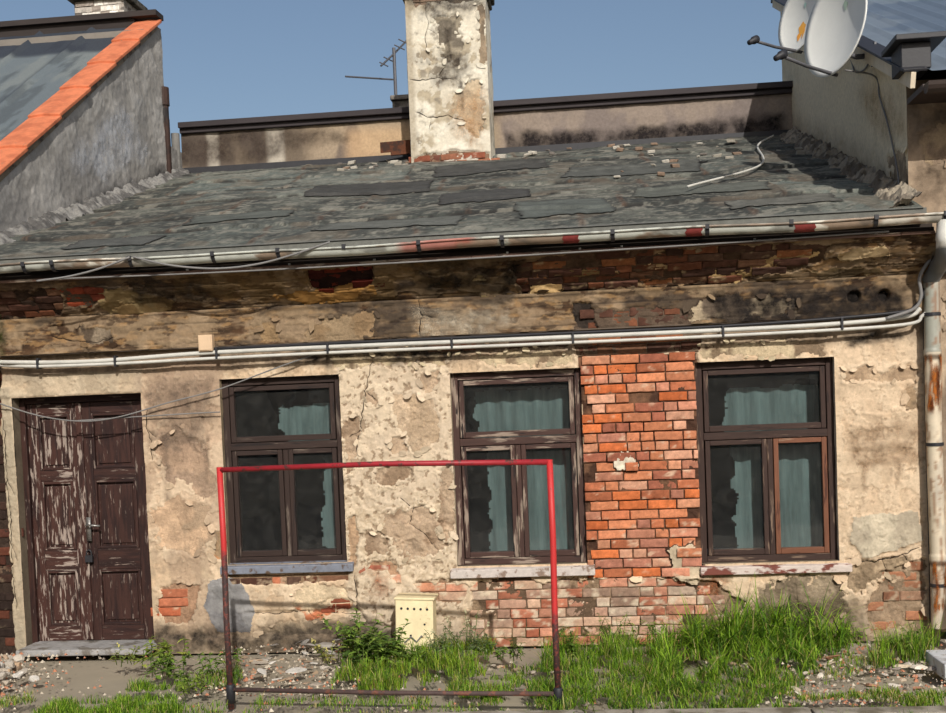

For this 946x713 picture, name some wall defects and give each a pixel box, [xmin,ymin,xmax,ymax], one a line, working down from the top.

flaking render [413,0,487,138]
flaking render [408,150,500,163]
flaking render [0,283,105,319]
flaking render [308,266,385,293]
rust [925,356,942,410]
flaking render [330,241,929,647]
flaking render [149,424,221,564]
flaking render [0,400,40,690]
flaking render [228,458,459,639]
flaking render [150,581,201,624]
rust [932,563,946,611]